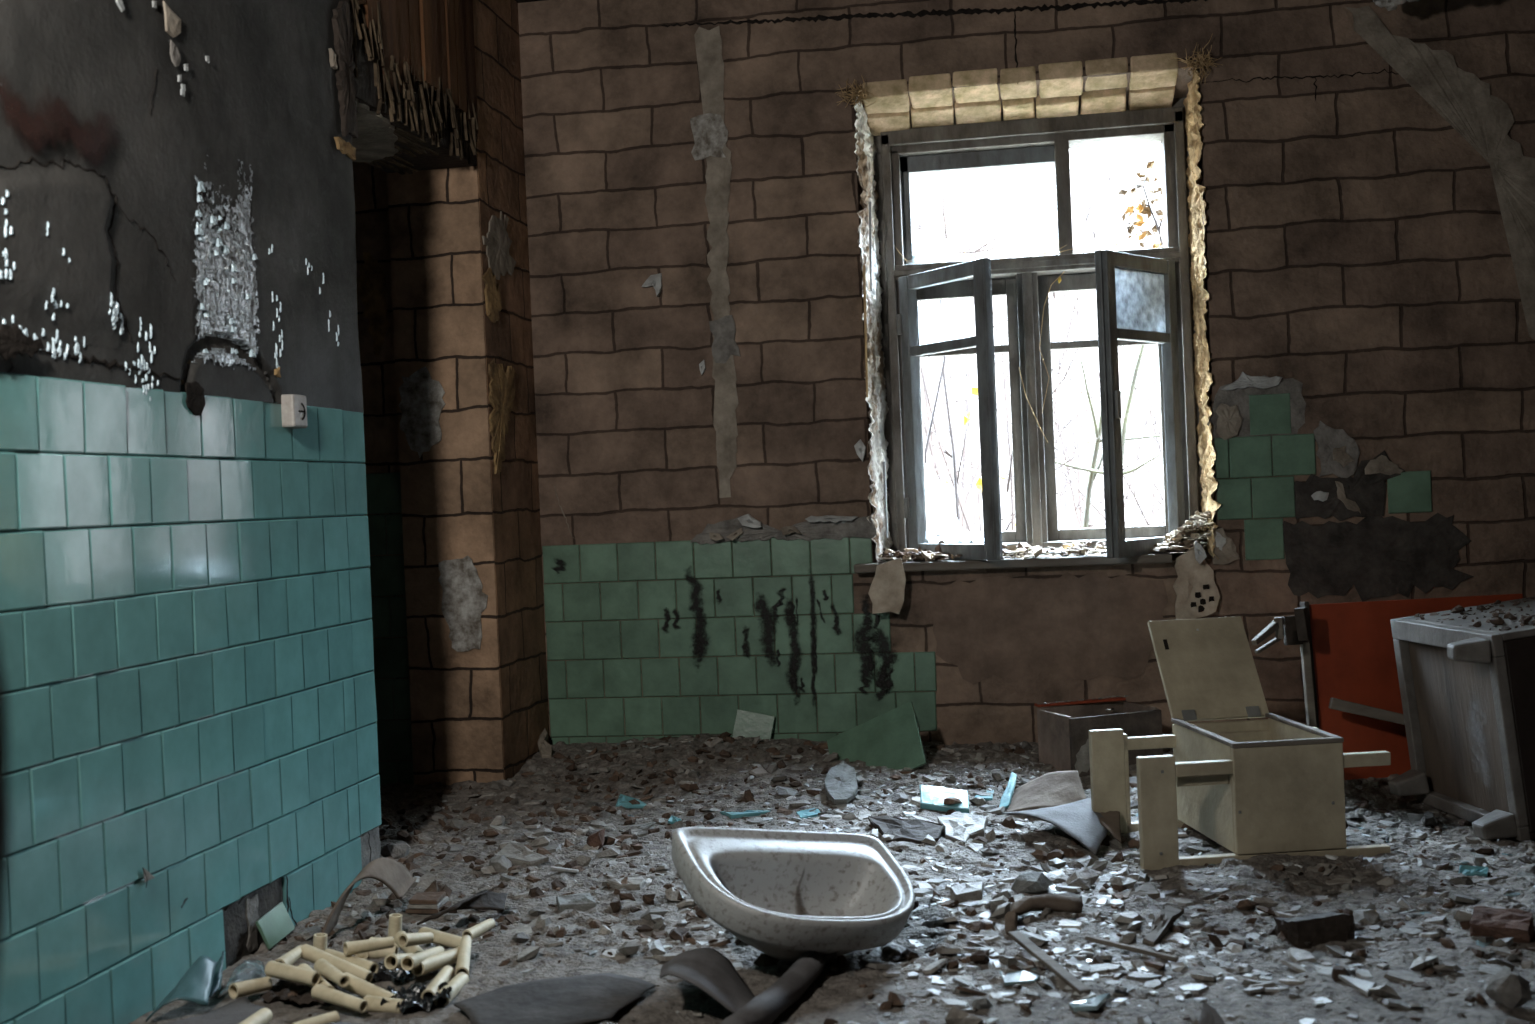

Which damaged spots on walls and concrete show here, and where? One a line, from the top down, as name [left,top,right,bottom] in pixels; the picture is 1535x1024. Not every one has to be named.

peeling [181,155,260,416]
water stain [662,568,722,667]
water stain [742,576,897,705]